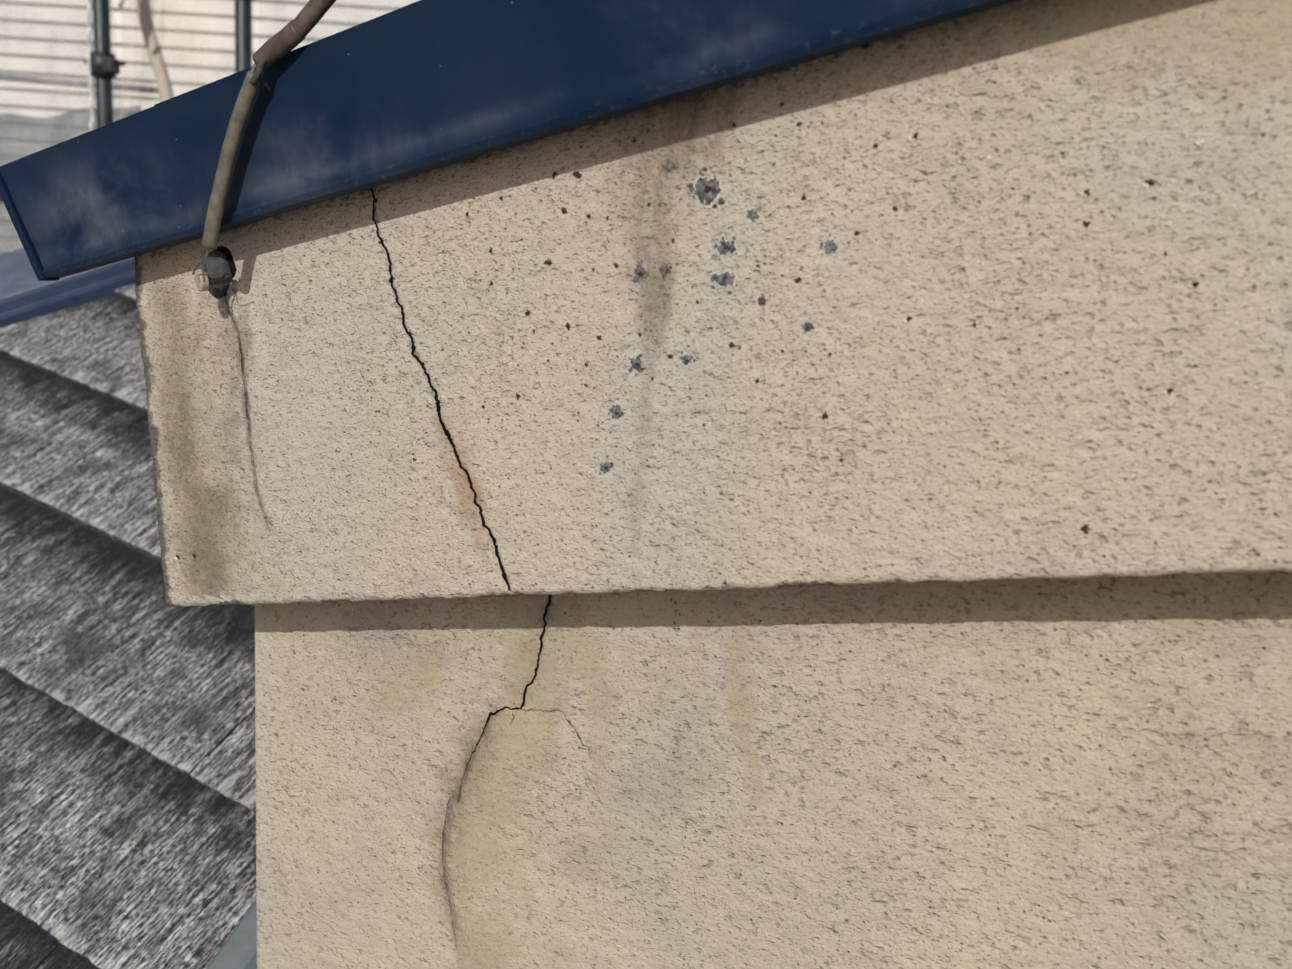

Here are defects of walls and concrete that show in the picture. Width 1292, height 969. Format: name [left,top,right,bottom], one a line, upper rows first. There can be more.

crack [371,187,510,591]
crack [442,595,589,948]